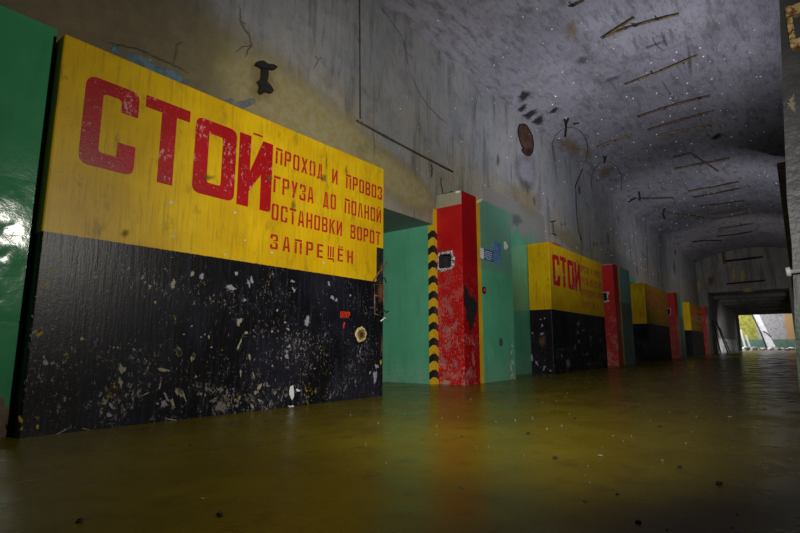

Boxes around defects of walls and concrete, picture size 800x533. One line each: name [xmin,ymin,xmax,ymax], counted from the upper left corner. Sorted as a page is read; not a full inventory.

peeling [439,295,476,385]
peeling [145,367,187,408]
peeling [209,387,238,412]